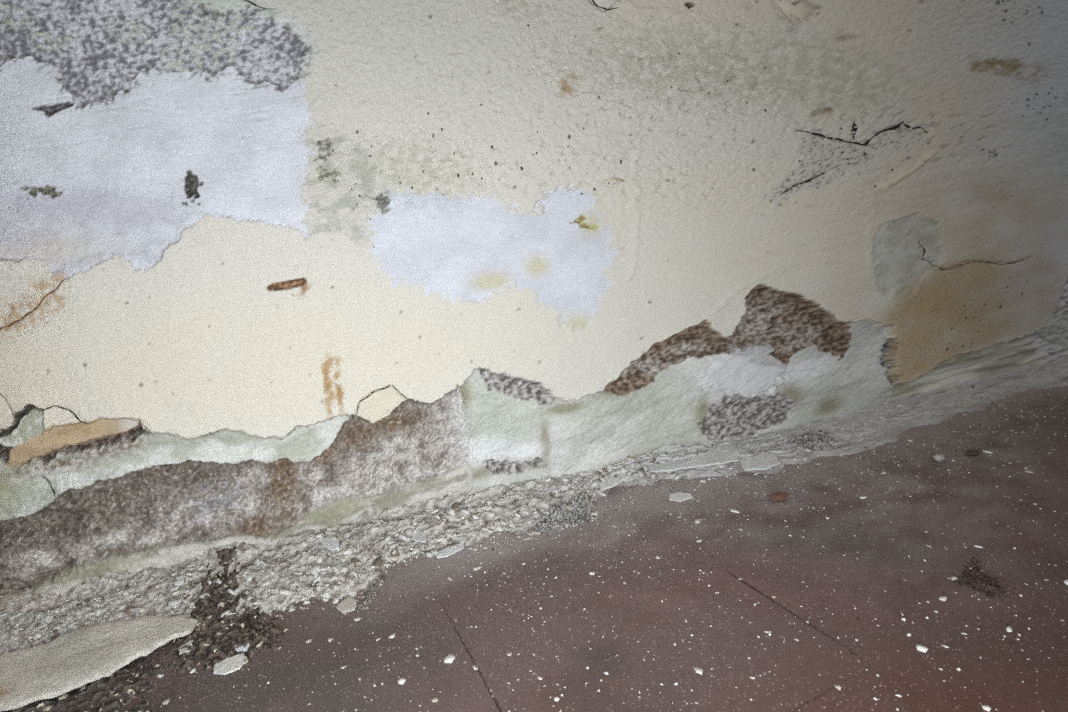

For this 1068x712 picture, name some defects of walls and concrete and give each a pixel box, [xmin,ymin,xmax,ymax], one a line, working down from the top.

peeling [0,0,619,331]
peeling [872,213,944,298]
crack [0,278,66,330]
spalling [0,285,1056,595]
peeling [336,597,357,613]
peeling [213,643,250,675]